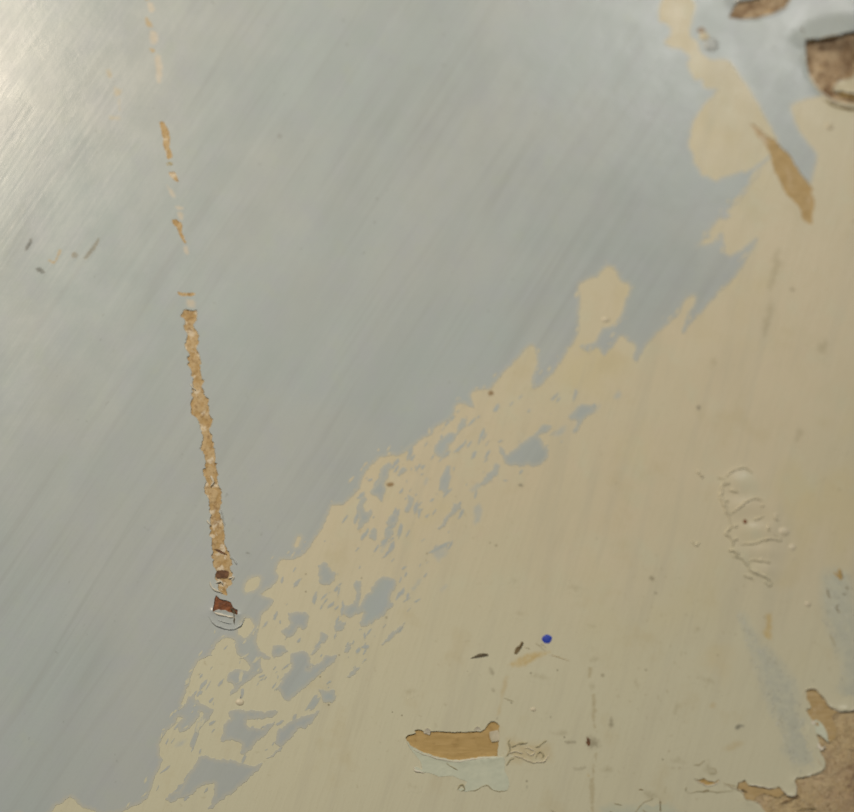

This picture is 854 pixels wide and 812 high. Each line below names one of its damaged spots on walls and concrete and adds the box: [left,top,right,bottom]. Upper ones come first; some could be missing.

peeling [659,0,814,224]
spalling [801,18,854,111]
peeling [160,386,624,809]
peeling [736,688,854,812]